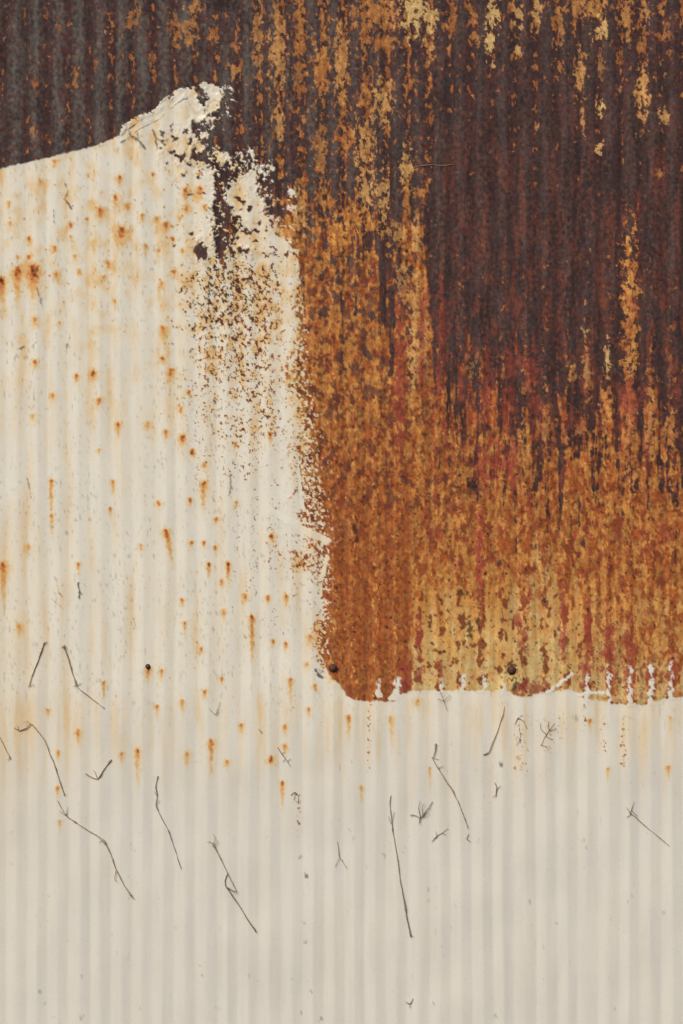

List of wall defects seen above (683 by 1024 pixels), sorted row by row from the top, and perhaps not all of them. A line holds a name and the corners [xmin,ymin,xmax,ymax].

peeling [134,86,335,685]
rust [0,0,683,754]
peeling [412,561,683,708]
rust [117,746,145,792]
rust [181,720,246,789]
rust [263,720,292,815]